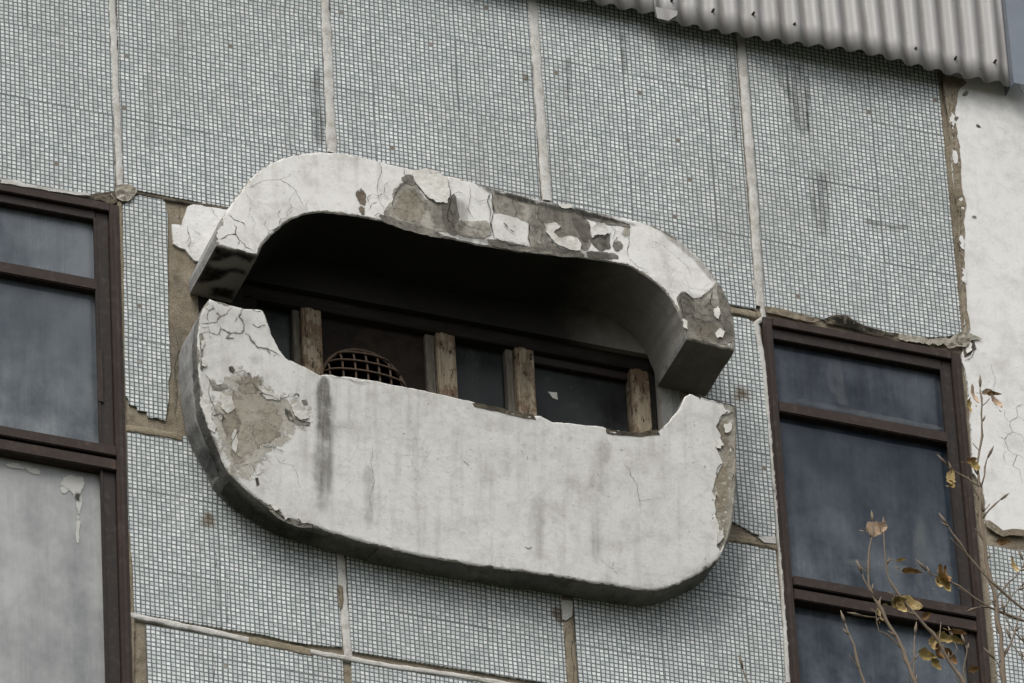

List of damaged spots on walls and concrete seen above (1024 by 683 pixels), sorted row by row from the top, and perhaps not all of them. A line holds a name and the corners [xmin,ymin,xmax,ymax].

crack [178,177,307,252]
peeling [379,168,631,259]
spalling [765,76,982,361]
crack [203,305,281,356]
peeling [677,283,735,345]
peeling [199,333,311,454]
peeling [712,411,735,551]